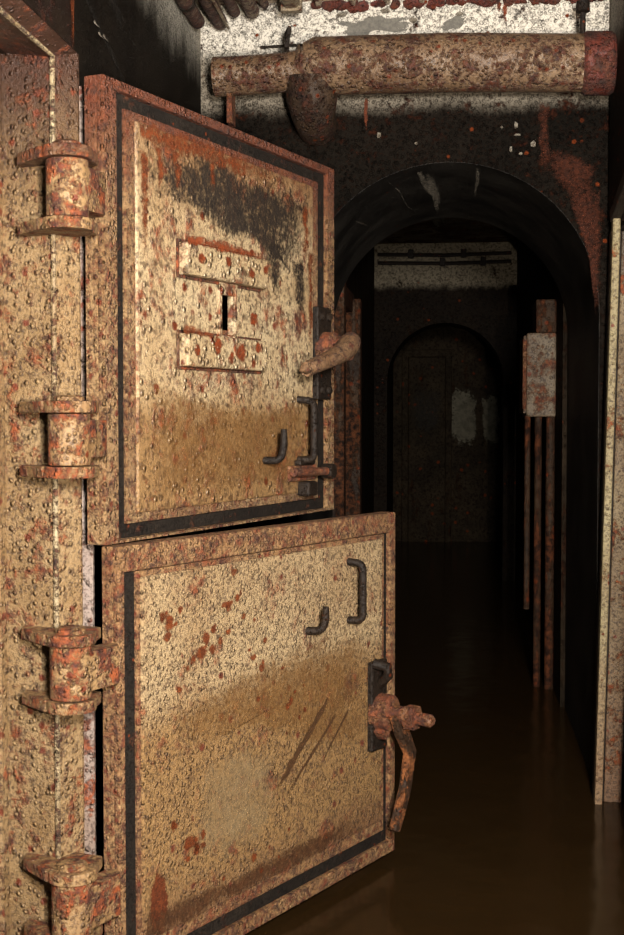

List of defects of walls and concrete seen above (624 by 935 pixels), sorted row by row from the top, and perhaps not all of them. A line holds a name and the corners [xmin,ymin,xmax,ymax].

rust [310,0,578,21]
rust [538,104,601,301]